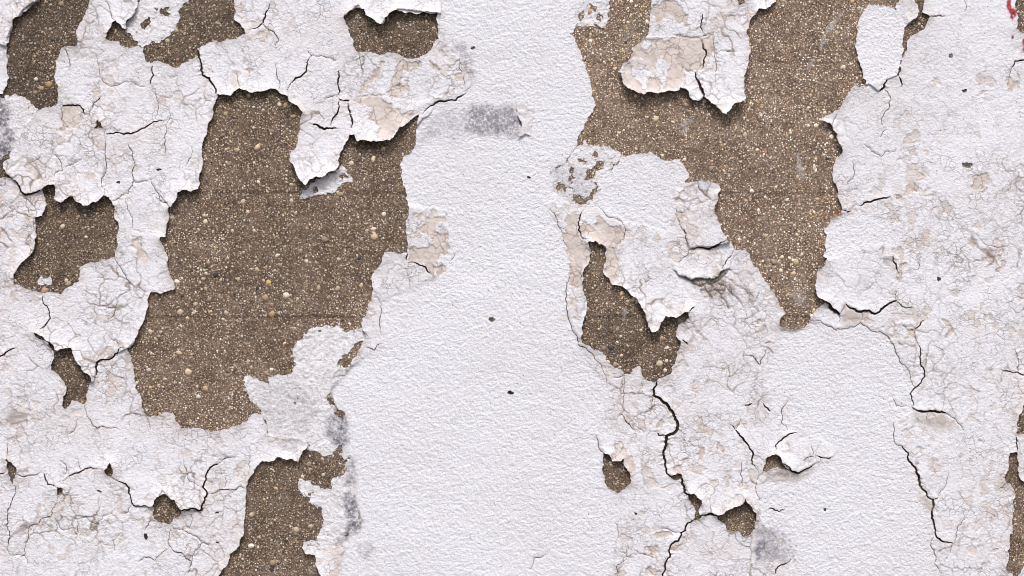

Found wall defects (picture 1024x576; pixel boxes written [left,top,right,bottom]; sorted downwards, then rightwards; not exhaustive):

crack [252,4,364,130]
crack [61,56,193,228]
peeling [555,0,929,382]
peeling [0,0,470,524]
crack [0,445,250,572]
peeling [218,443,350,576]
peeling [602,441,636,493]
crack [550,206,718,576]
crack [733,403,831,512]
crack [812,258,965,572]
peeling [1005,452,1024,576]
peeling [1016,405,1024,435]